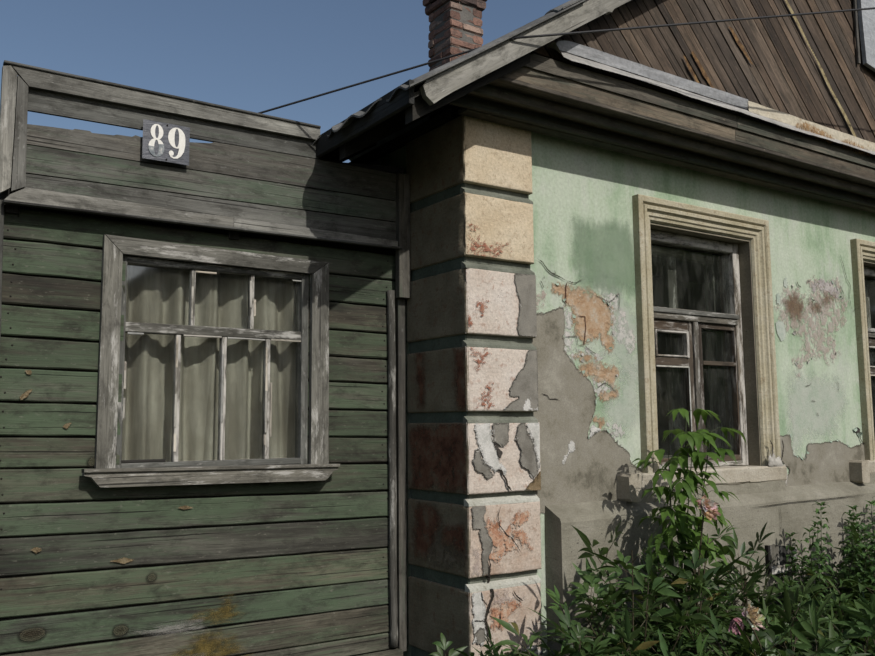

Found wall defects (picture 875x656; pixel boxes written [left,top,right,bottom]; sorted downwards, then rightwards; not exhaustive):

spalling [409,273,642,576]
peeling [775,275,865,486]
peeling [472,589,525,646]
crack [476,559,523,642]